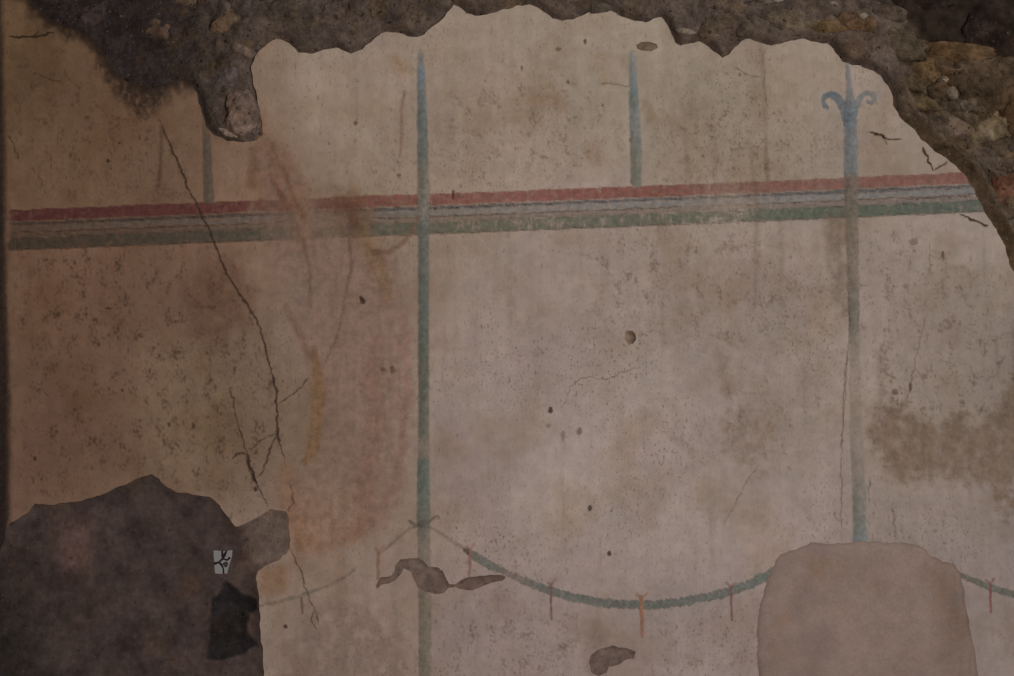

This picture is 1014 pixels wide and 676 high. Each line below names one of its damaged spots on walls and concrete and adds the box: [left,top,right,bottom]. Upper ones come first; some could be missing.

spalling [30,0,1014,271]
crack [163,129,283,494]
damp [870,374,1014,506]
spalling [0,474,290,676]
spalling [376,558,505,594]
spalling [589,646,635,676]